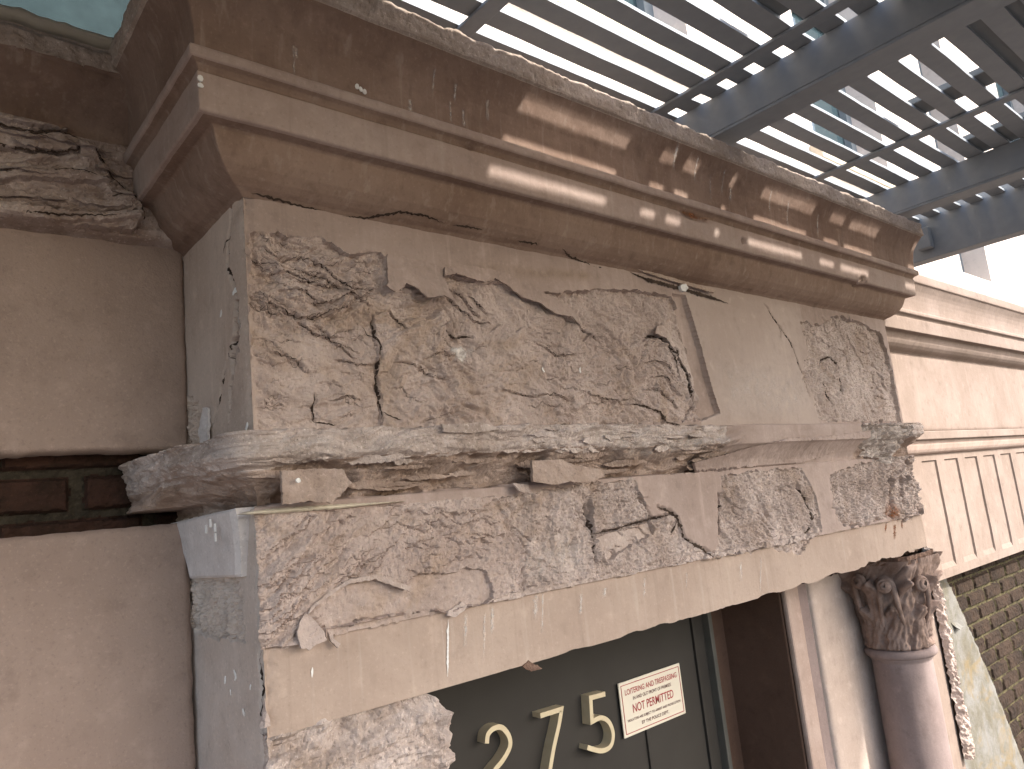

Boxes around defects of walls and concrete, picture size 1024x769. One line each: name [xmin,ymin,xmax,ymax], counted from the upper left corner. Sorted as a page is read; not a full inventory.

spalling [0,112,183,260]
crack [252,193,320,210]
crack [631,272,728,304]
crack [363,320,400,420]
crack [645,335,694,403]
crack [766,307,843,401]
crack [310,394,335,426]
spalling [187,230,924,650]
crack [634,403,680,425]
crack [582,494,714,562]
flaking render [932,579,1024,769]
spalling [259,693,455,769]